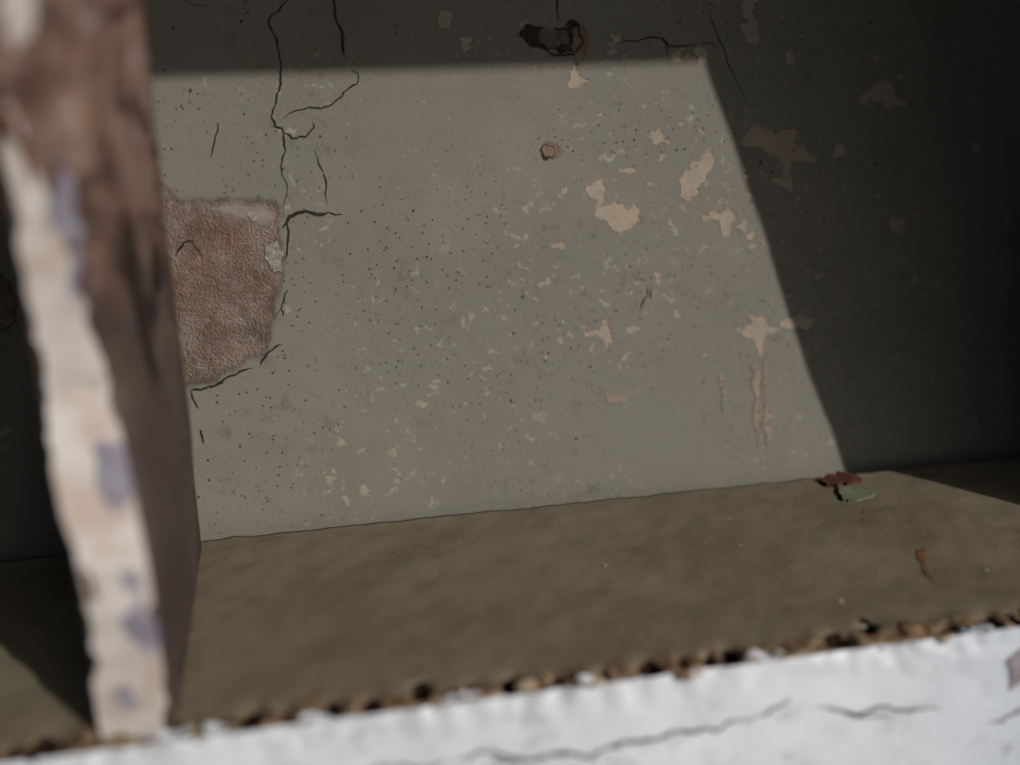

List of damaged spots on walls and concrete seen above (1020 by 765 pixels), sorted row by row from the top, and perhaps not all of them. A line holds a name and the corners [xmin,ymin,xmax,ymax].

peeling [0,0,35,50]
crack [620,36,721,56]
crack [268,0,359,259]
peeling [561,178,642,234]
crack [190,344,283,443]
peeling [0,103,291,751]
spalling [825,633,854,650]
spalling [502,673,562,697]
spalling [638,647,789,682]
peeling [1007,650,1020,691]
spalling [283,697,380,723]
spalling [4,735,62,765]